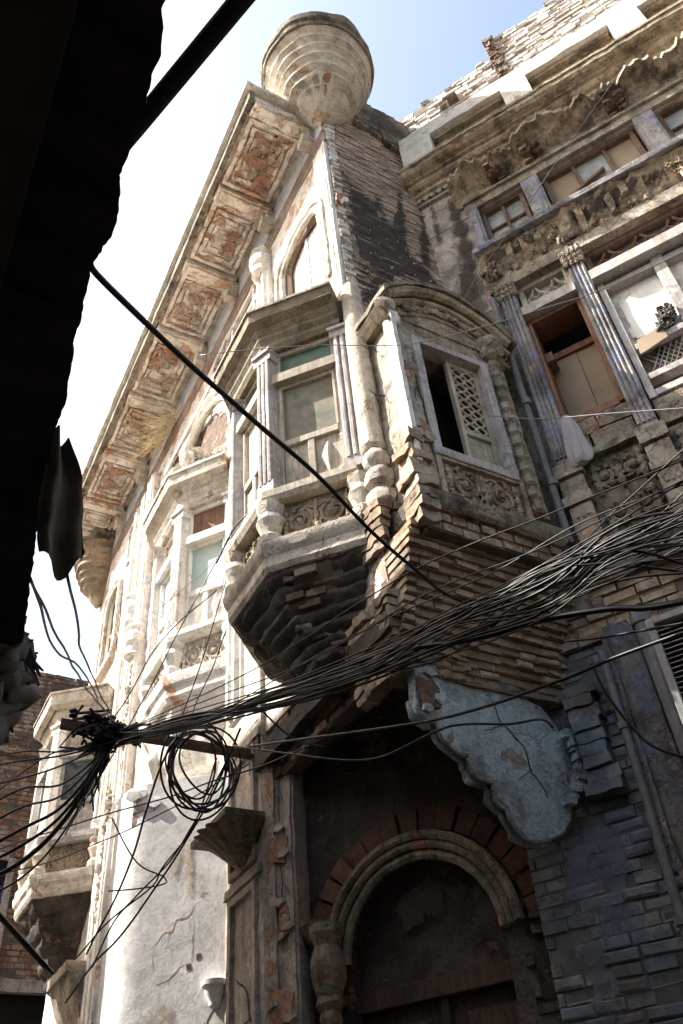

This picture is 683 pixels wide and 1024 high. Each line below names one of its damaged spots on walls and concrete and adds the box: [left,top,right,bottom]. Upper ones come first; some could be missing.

spalling [230,131,297,198]
spalling [197,212,255,274]
damp [341,137,679,310]
spalling [171,281,224,331]
spalling [415,667,447,714]
crack [484,701,548,797]
crack [152,905,194,985]